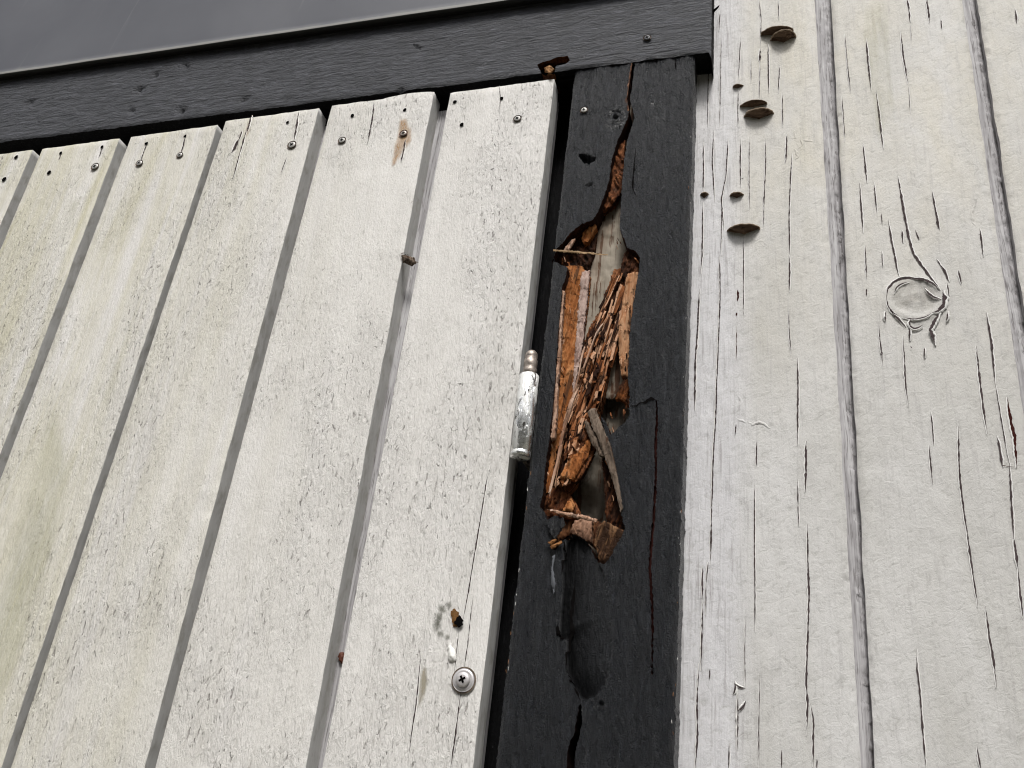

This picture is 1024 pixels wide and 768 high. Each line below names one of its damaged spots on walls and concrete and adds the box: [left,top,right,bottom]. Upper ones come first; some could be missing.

spalling [544,139,640,593]
crack [630,397,659,675]
crack [841,34,997,688]
crack [975,312,1023,619]